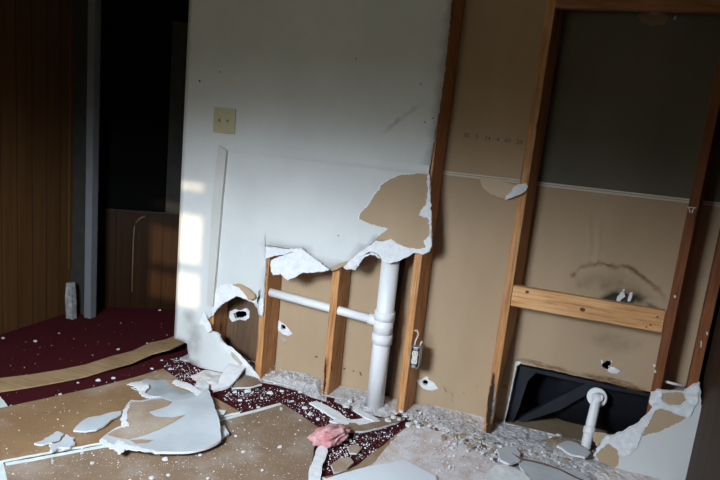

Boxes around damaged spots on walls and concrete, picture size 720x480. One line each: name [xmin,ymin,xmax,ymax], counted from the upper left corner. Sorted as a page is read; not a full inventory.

spalling [199,284,264,333]
damp [602,292,652,307]
spalling [222,342,262,382]